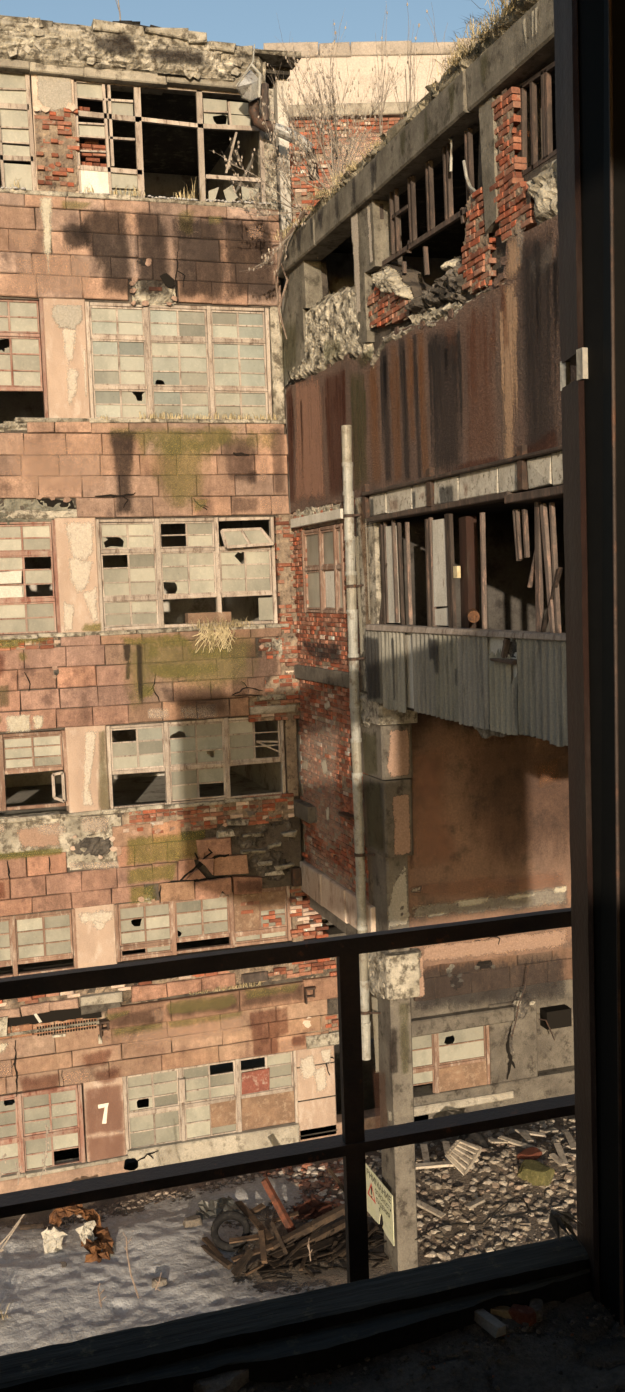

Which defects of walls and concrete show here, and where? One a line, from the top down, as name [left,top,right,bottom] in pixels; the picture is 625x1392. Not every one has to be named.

spalling [458,0,539,73]
spalling [0,16,244,192]
spalling [333,133,388,197]
water stain [40,198,275,297]
flaking render [351,81,537,368]
corrosion [368,332,429,481]
water stain [111,433,132,512]
peeling [0,494,98,651]
flaking render [248,499,344,722]
water stain [122,634,231,698]
crack [159,848,232,901]